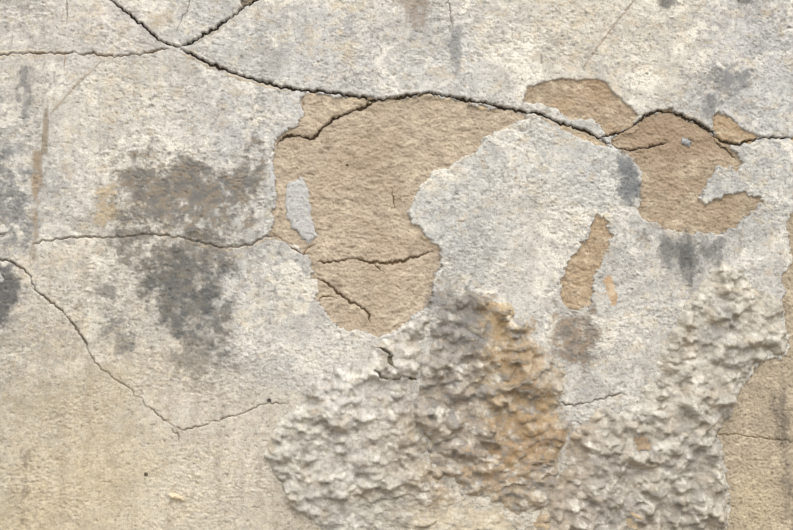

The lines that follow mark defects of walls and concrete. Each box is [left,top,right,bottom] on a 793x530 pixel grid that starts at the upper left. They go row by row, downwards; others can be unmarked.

leakage [0,263,20,324]
leakage [0,149,31,245]
crack [0,259,286,442]
leakage [109,137,267,357]
crack [35,233,433,322]
crack [374,347,416,380]
crack [0,0,792,160]
spalling [268,93,526,338]
spalling [560,215,618,311]
crack [557,393,625,407]
spalling [523,79,762,235]
spalling [717,213,793,530]